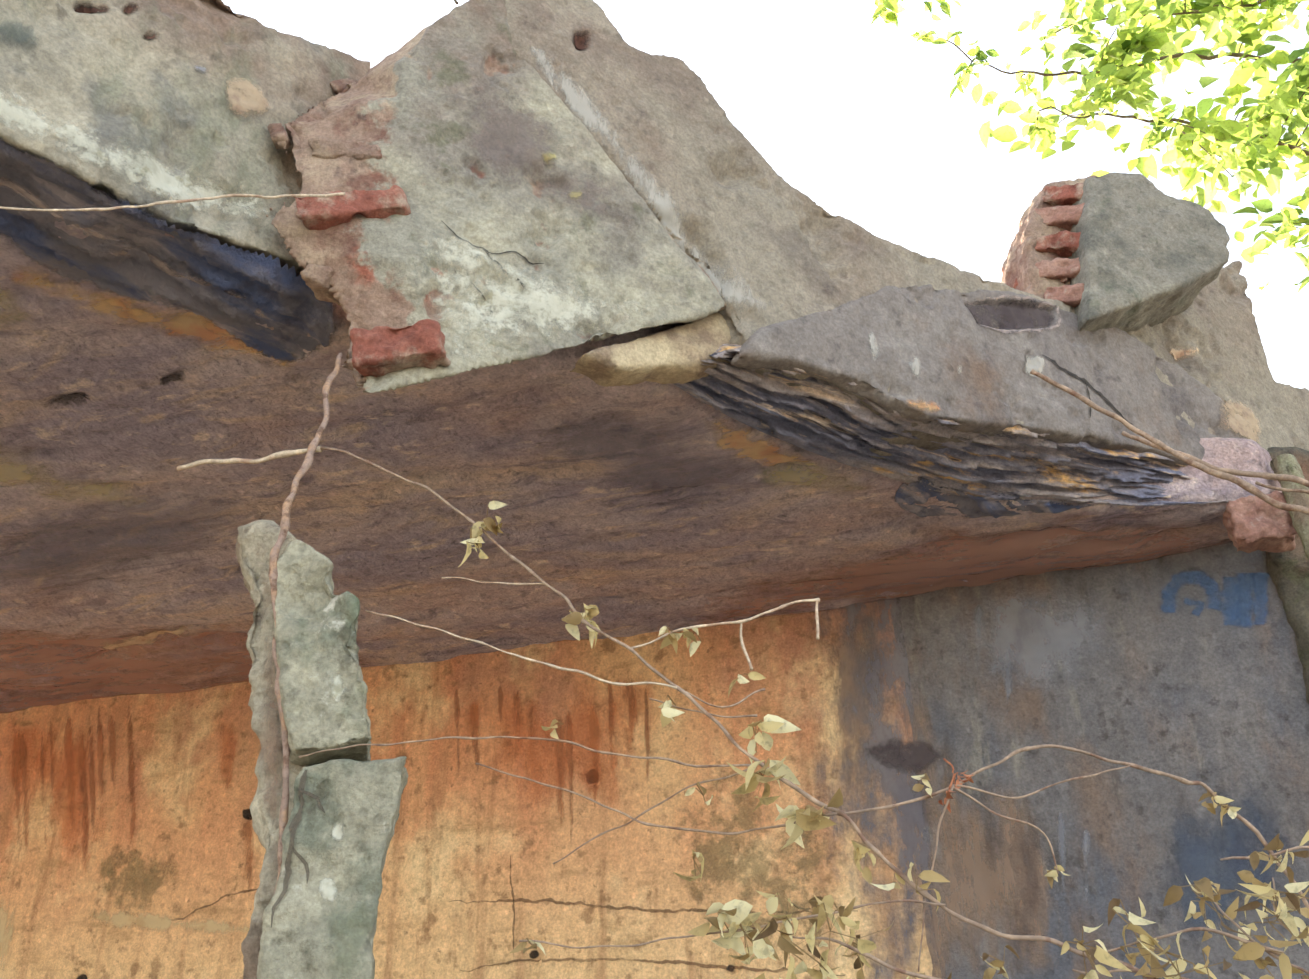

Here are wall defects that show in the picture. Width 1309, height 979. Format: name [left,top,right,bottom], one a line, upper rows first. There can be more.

corrosion [0,630,252,856]
corrosion [556,717,572,795]
corrosion [590,684,613,768]
corrosion [628,685,649,772]
crack [449,856,845,976]